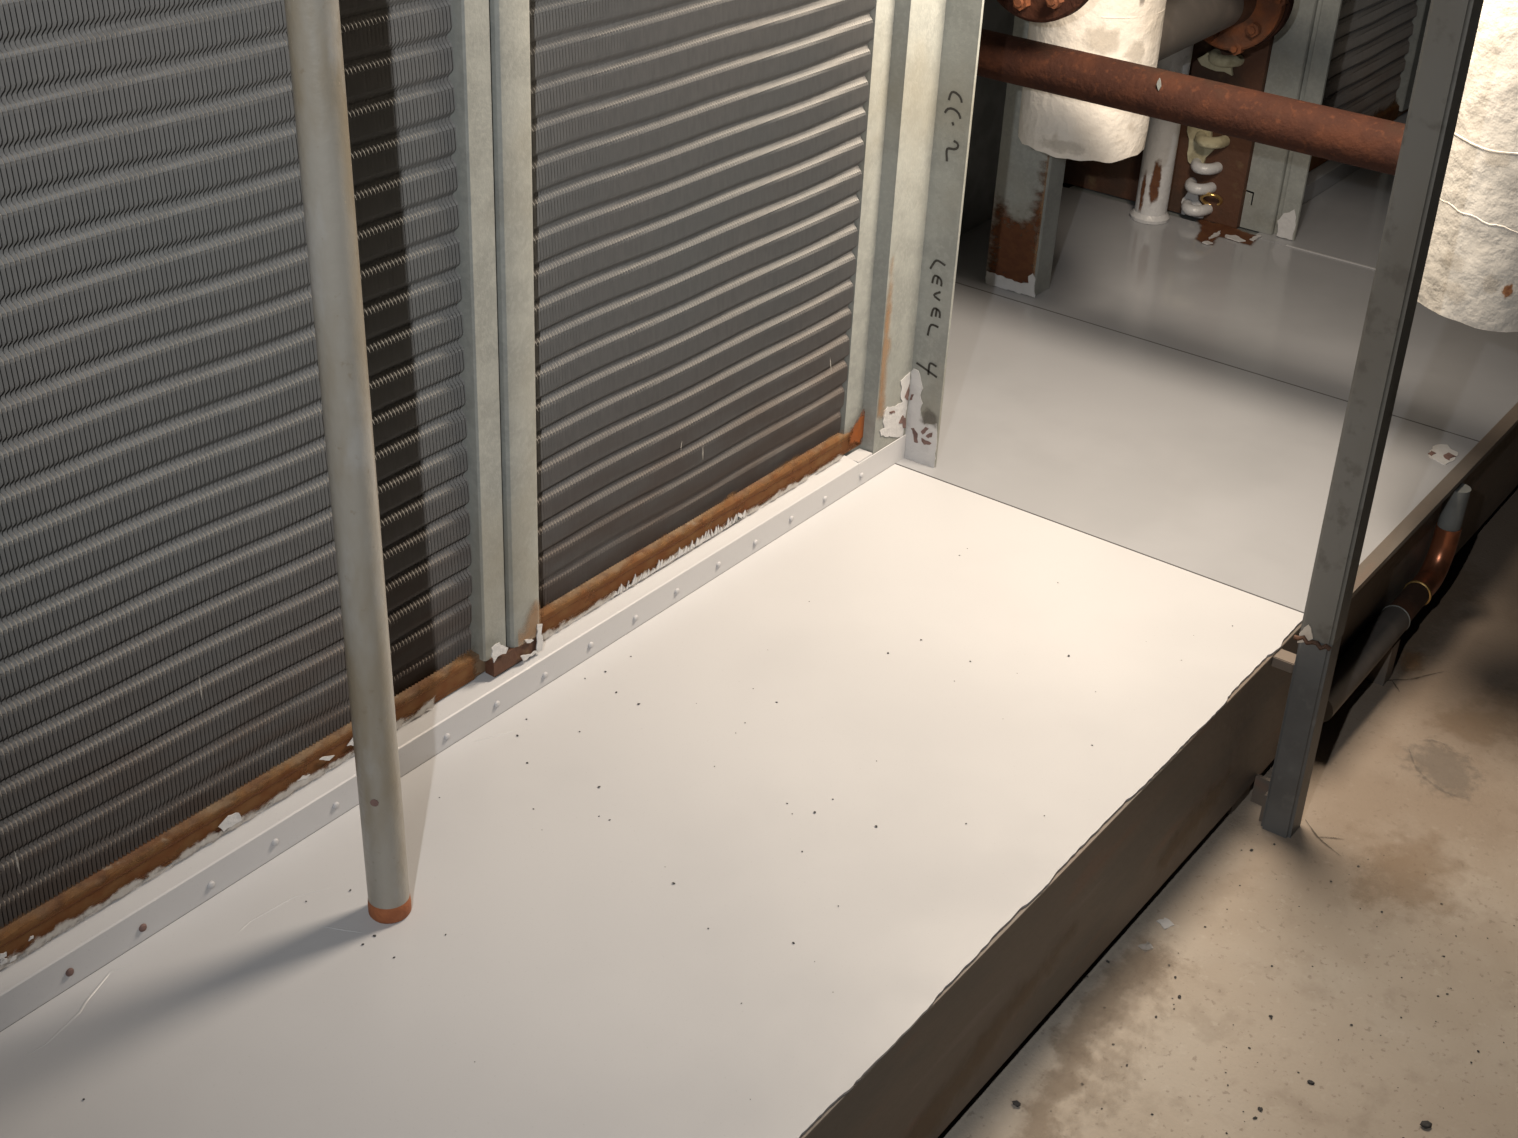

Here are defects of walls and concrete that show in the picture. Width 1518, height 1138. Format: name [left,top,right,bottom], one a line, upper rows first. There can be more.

rust [987,157,1049,296]
rust [1309,156,1327,171]
rust [1373,99,1399,121]
rust [518,296,890,645]
rust [395,656,480,722]
rust [0,729,354,959]